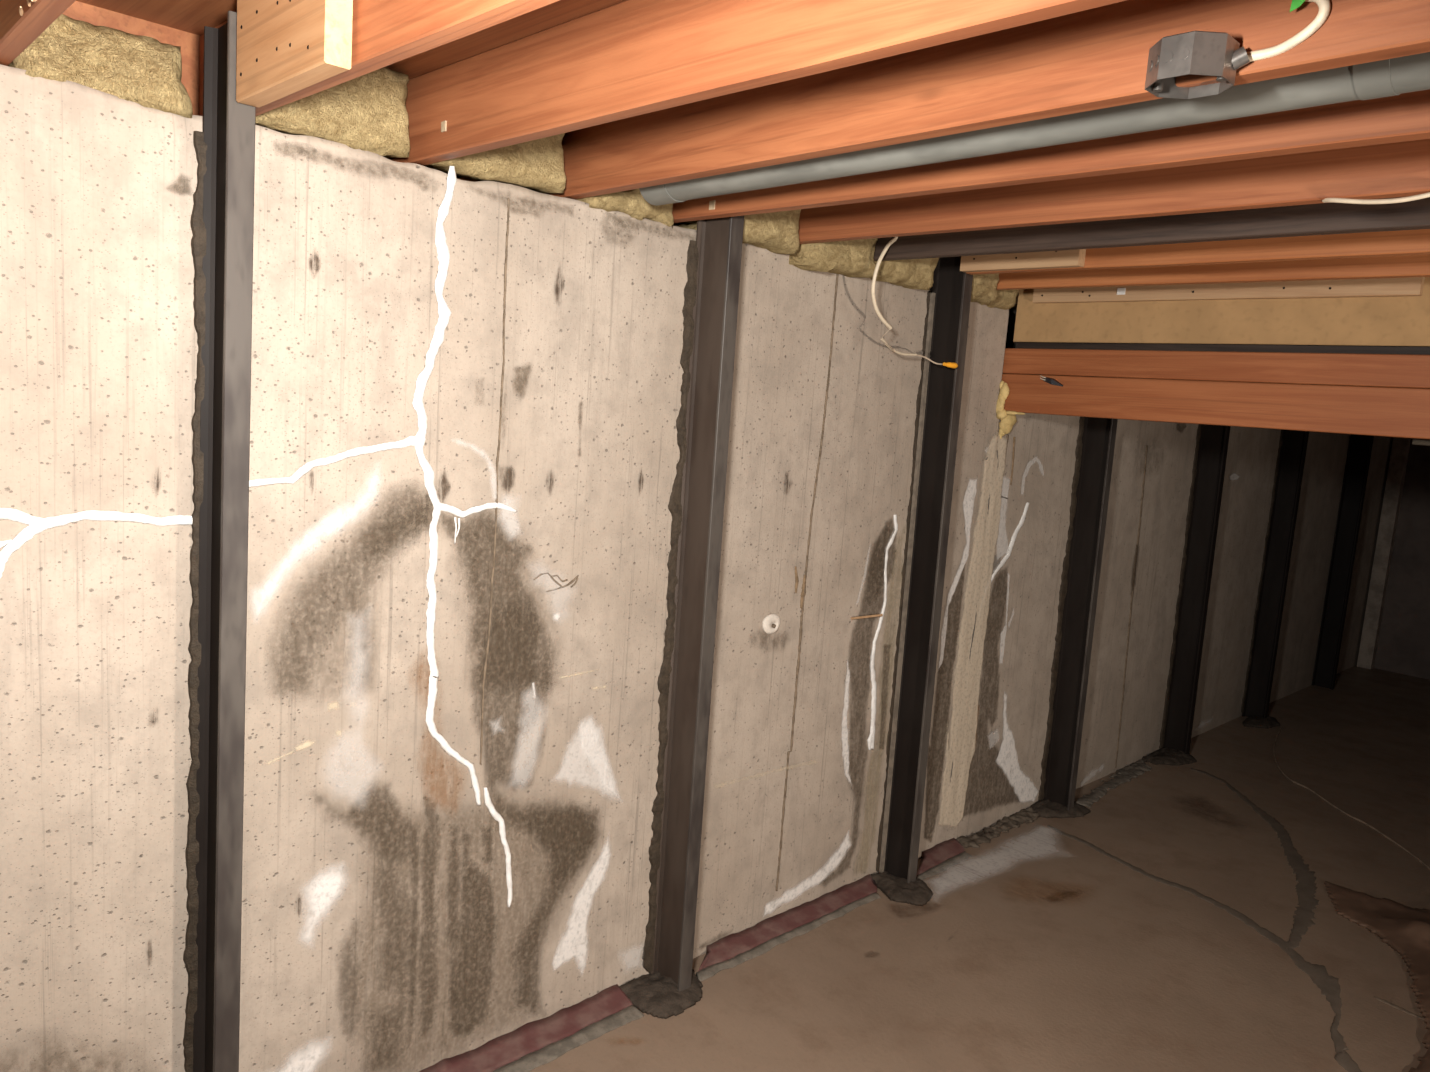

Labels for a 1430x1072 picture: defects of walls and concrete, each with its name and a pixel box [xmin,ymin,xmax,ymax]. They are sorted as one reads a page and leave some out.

water stain [515,367,530,394]
crack [0,507,192,578]
crack [249,166,517,908]
water stain [450,518,548,785]
efflorescence [558,721,615,794]
water stain [765,521,895,914]
crack [867,514,898,750]
efflorescence [304,869,343,940]
water stain [349,789,609,1068]
crack [1048,768,1425,1072]
efflorescence [281,1043,325,1072]